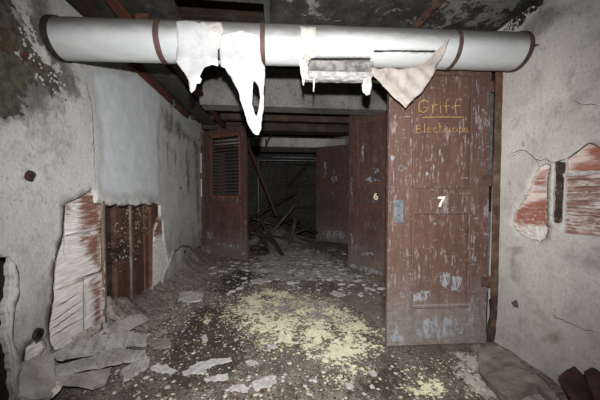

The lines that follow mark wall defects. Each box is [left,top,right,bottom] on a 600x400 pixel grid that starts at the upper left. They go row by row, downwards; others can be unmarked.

flaking render [513,142,600,242]
flaking render [6,190,169,397]
peeling [178,286,354,391]
peeling [395,359,486,399]